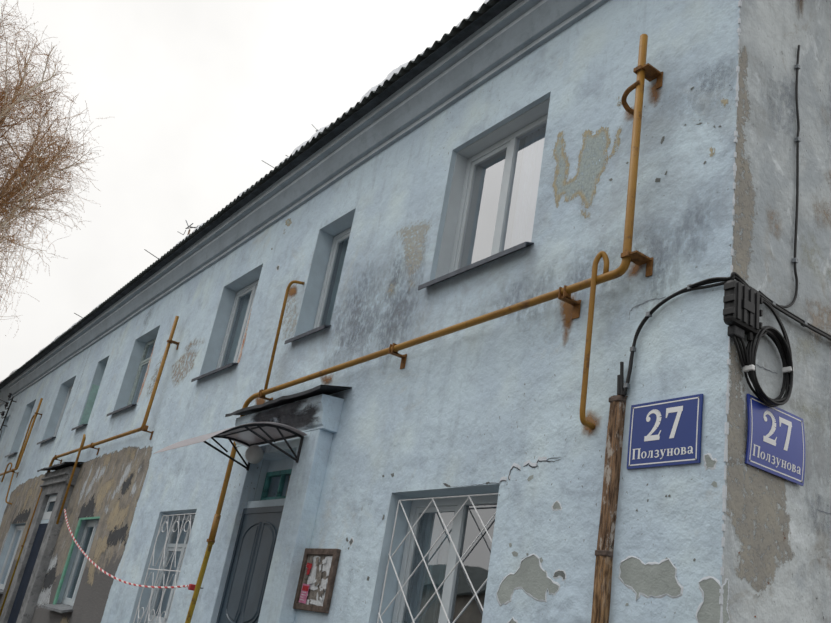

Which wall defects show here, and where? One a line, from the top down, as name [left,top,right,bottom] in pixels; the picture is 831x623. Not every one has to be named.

peeling [552,127,621,217]
corrosion [562,298,573,341]
damp [278,405,316,426]
crack [447,456,561,487]
peeling [695,344,795,623]
flaking render [0,471,51,610]
flaking render [31,446,152,623]
flaking render [496,543,567,607]
flaking render [618,556,684,606]